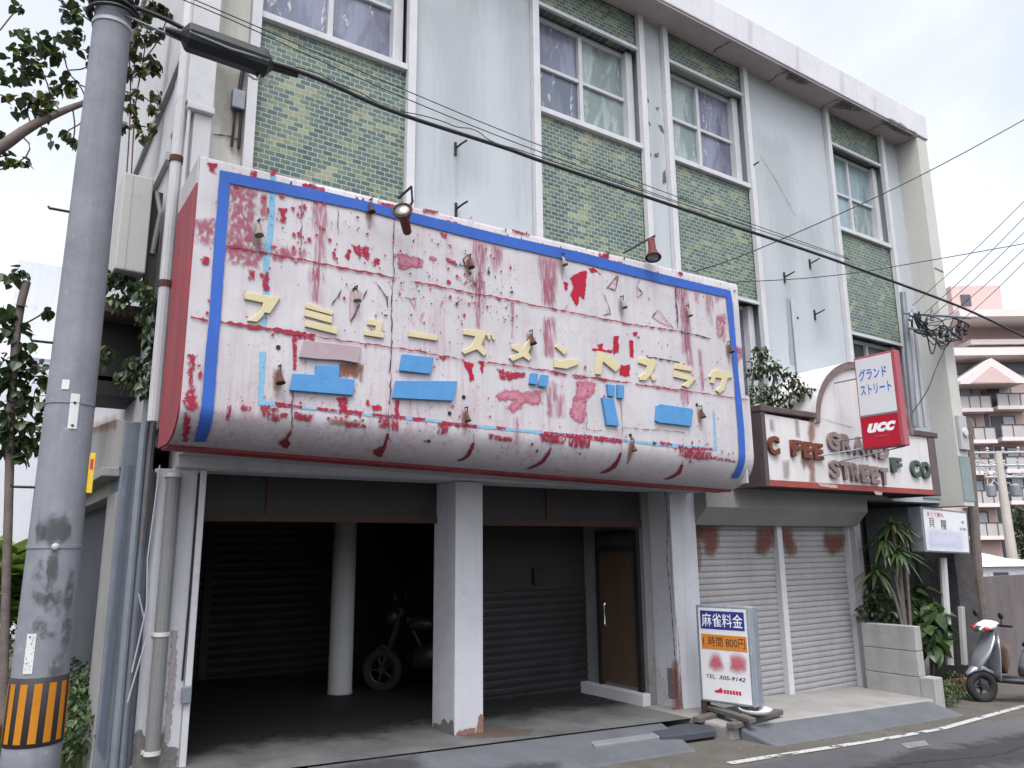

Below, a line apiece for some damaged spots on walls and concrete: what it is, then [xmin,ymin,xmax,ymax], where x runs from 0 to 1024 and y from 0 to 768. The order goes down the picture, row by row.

spalling [262,181,533,387]
peeling [226,248,736,463]
corrosion [696,525,719,570]
corrosion [756,529,797,555]
corrosion [825,532,845,554]
leakage [34,517,73,641]
spalling [433,714,484,736]